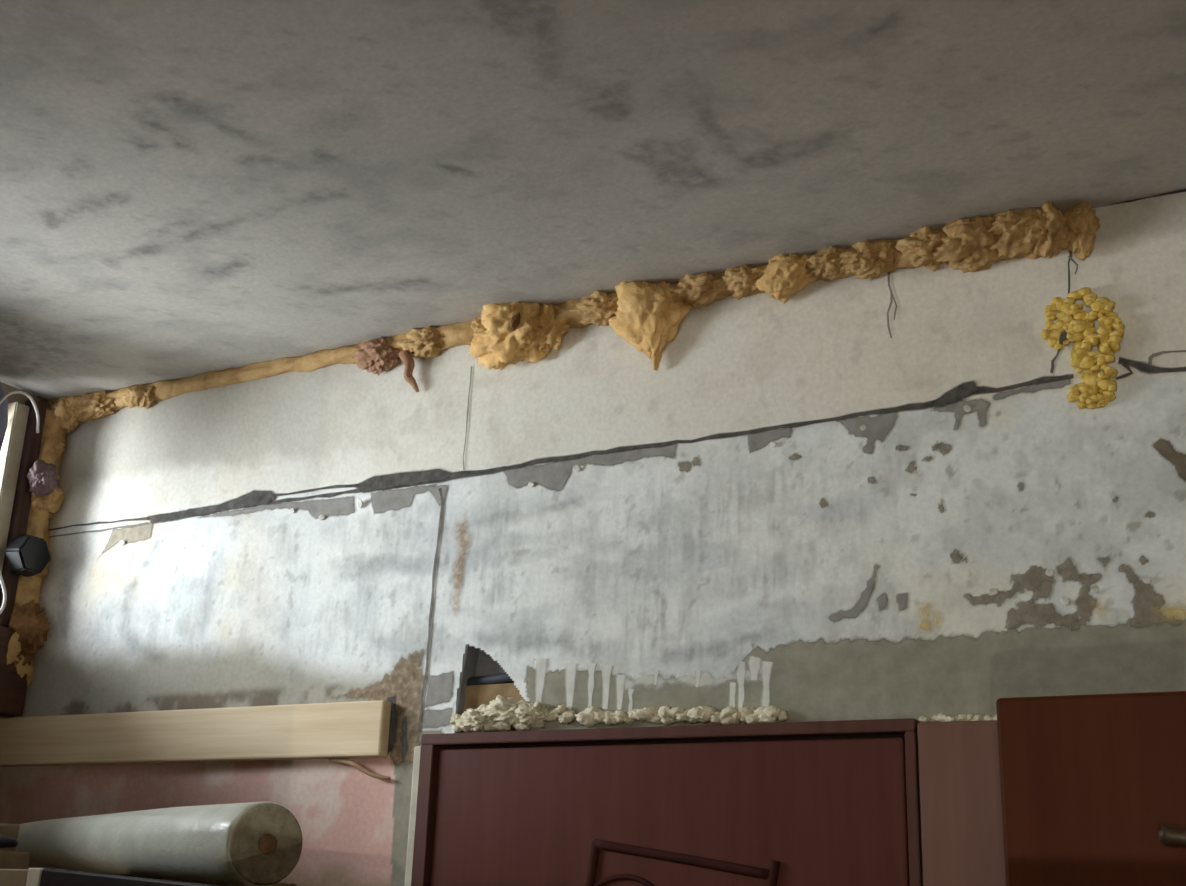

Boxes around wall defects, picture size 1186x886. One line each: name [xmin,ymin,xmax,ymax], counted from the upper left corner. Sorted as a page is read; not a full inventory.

crack [1067,251,1078,298]
crack [1116,350,1186,380]
peeling [933,379,1070,430]
peeling [504,444,700,491]
peeling [748,428,792,453]
peeling [837,412,897,454]
peeling [896,442,951,473]
flaking render [1153,439,1186,482]
crack [48,330,1074,732]
peeling [950,549,967,563]
spalling [331,556,1186,766]